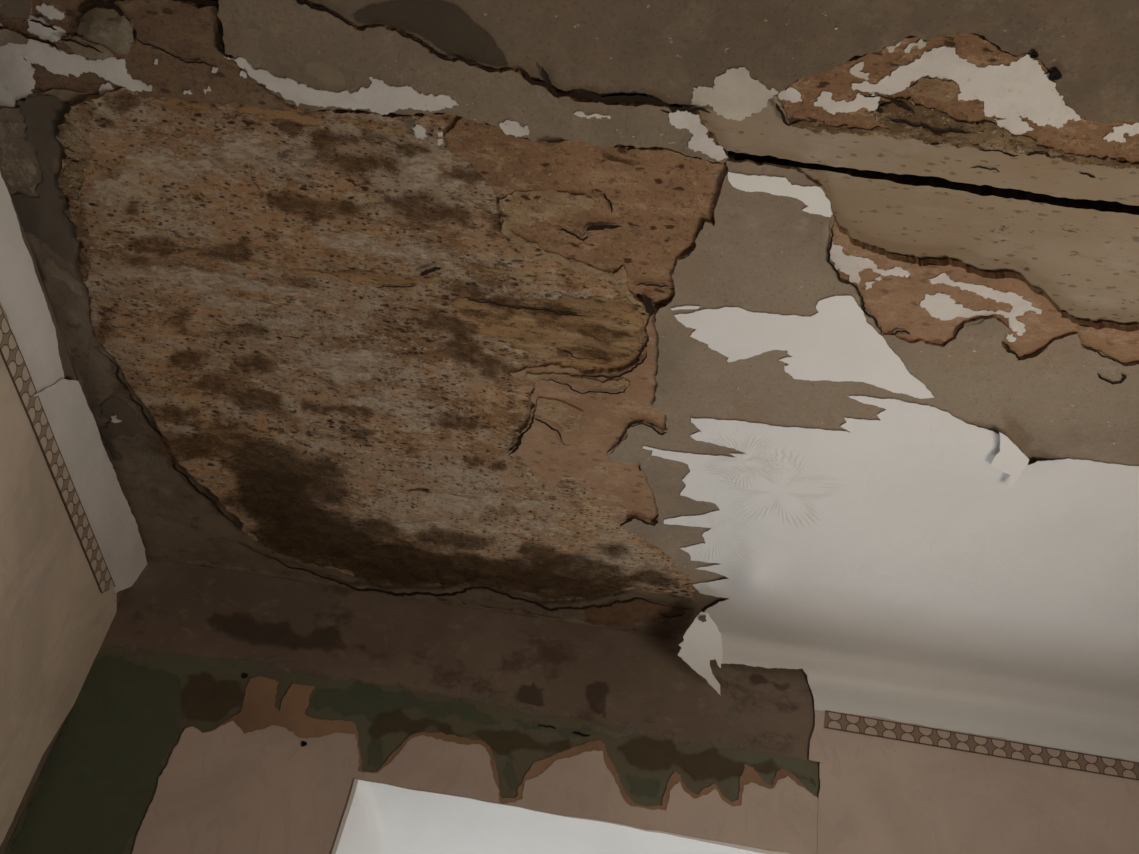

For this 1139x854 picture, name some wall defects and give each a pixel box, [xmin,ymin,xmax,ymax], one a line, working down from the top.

crack [0,19,104,53]
crack [80,0,231,67]
crack [296,0,360,30]
crack [397,31,711,113]
water stain [124,237,318,309]
spalling [0,0,1139,521]
water stain [100,350,691,601]
water stain [182,673,243,721]
water stain [369,710,460,740]
water stain [476,730,571,755]
water stain [619,737,779,780]